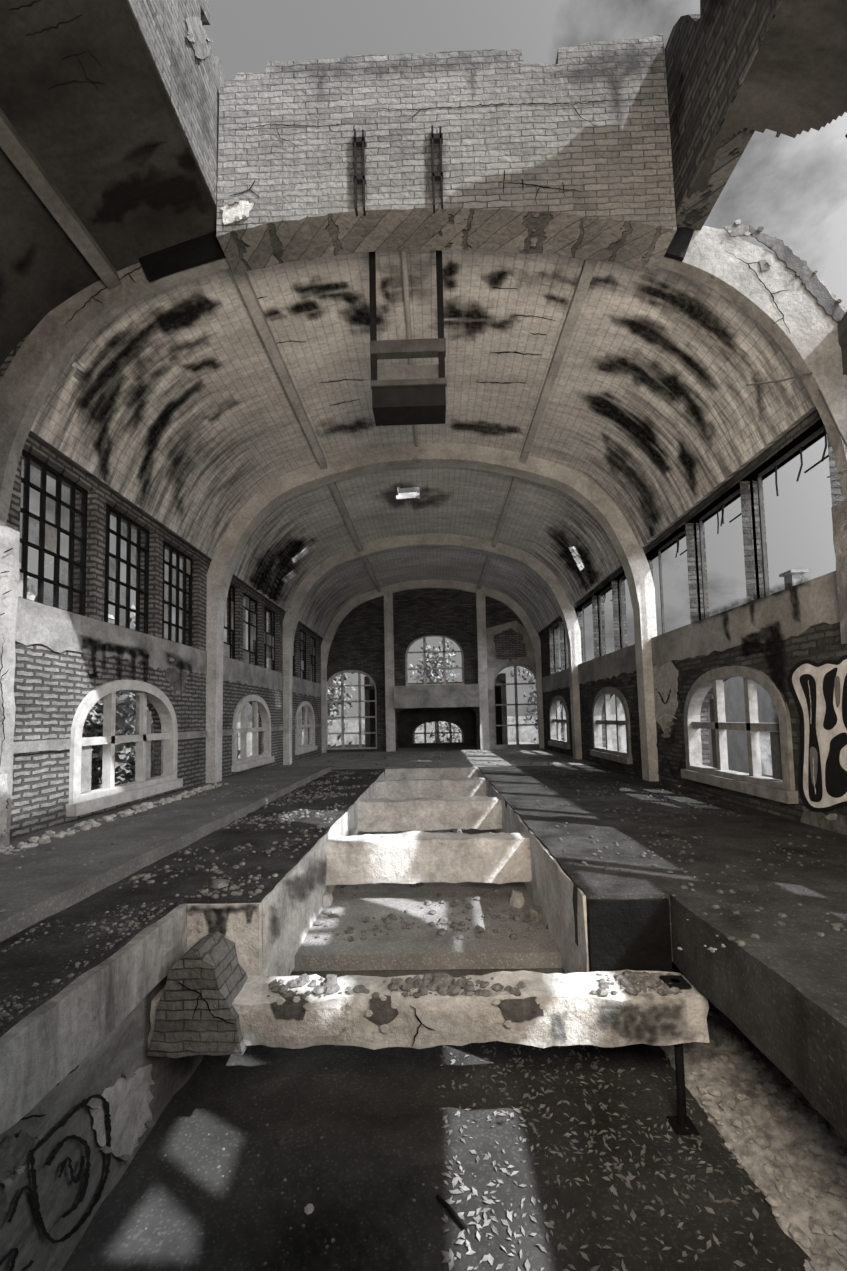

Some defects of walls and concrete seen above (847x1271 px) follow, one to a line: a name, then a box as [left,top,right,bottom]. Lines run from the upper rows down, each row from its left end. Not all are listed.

damp [264,283,358,318]
damp [570,277,615,285]
damp [614,319,714,387]
damp [639,279,735,348]
spalling [724,219,845,324]
damp [77,294,219,505]
damp [598,357,711,441]
damp [586,393,696,495]
damp [605,438,659,540]